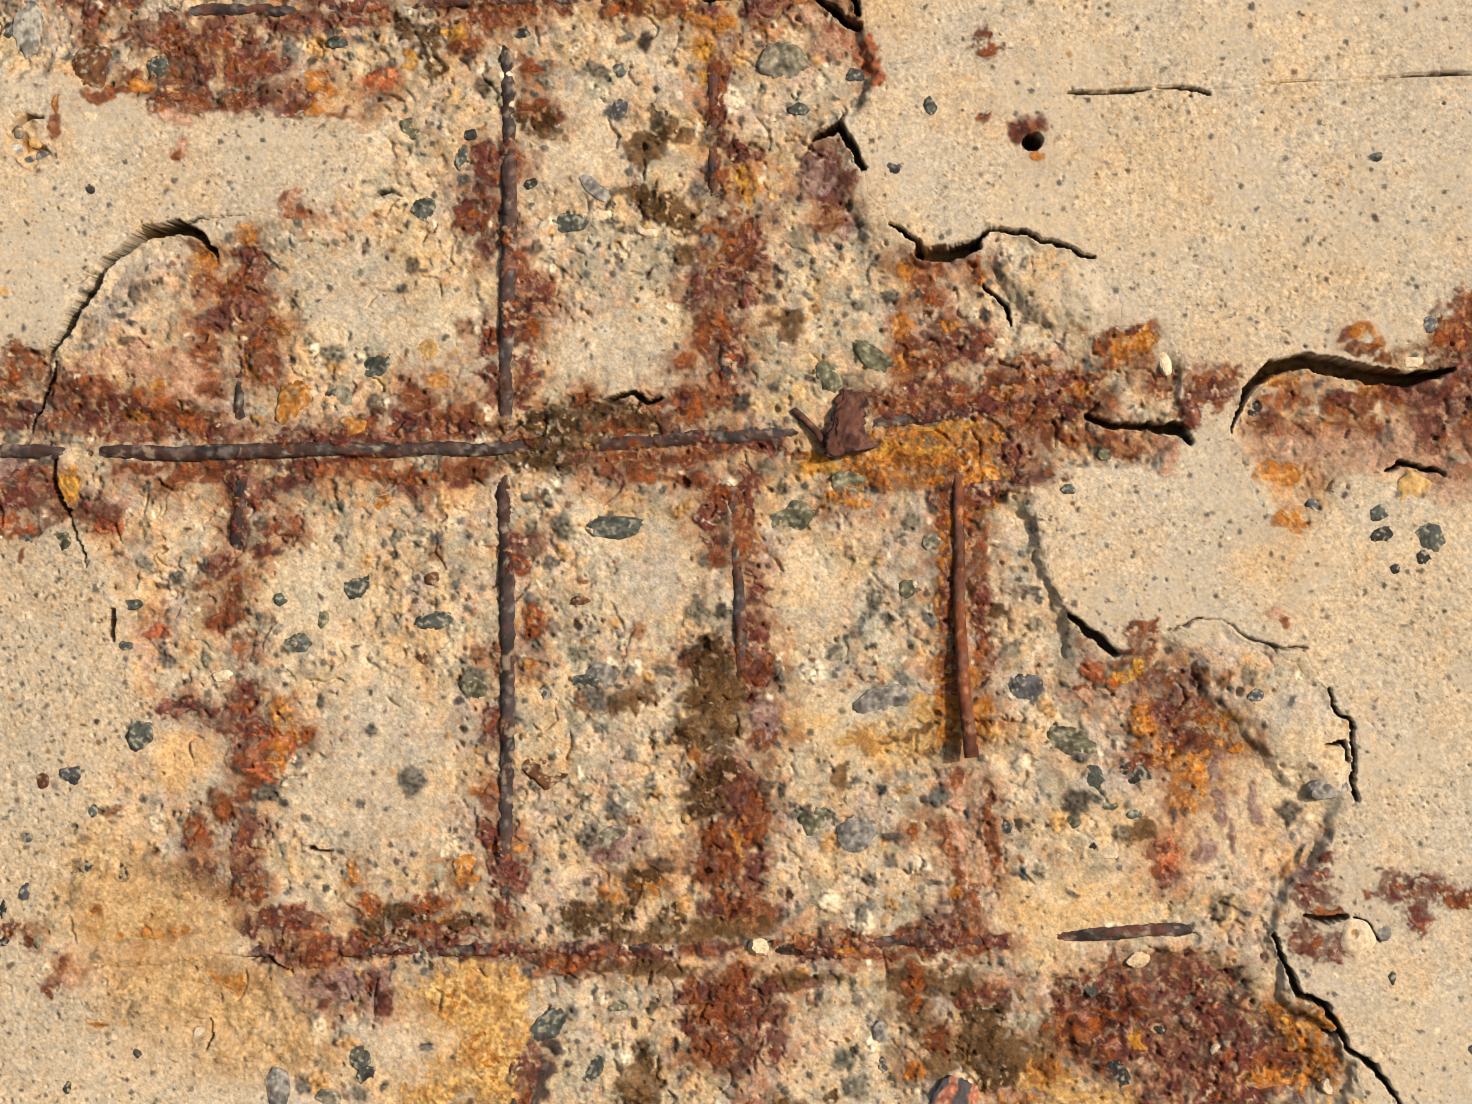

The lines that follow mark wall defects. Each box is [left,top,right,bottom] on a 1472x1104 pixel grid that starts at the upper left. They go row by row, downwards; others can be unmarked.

crack [42,207,281,408]
corrosion [571,0,1245,753]
crack [888,221,1095,327]
crack [1230,353,1448,435]
spalling [1230,288,1472,564]
corrosion [1250,282,1472,502]
corrosion [0,137,1011,1104]
spalling [59,766,81,785]
spalling [125,718,154,752]
corrosion [999,943,1351,1104]
spalling [1260,1015,1367,1104]
crack [1271,913,1401,1104]